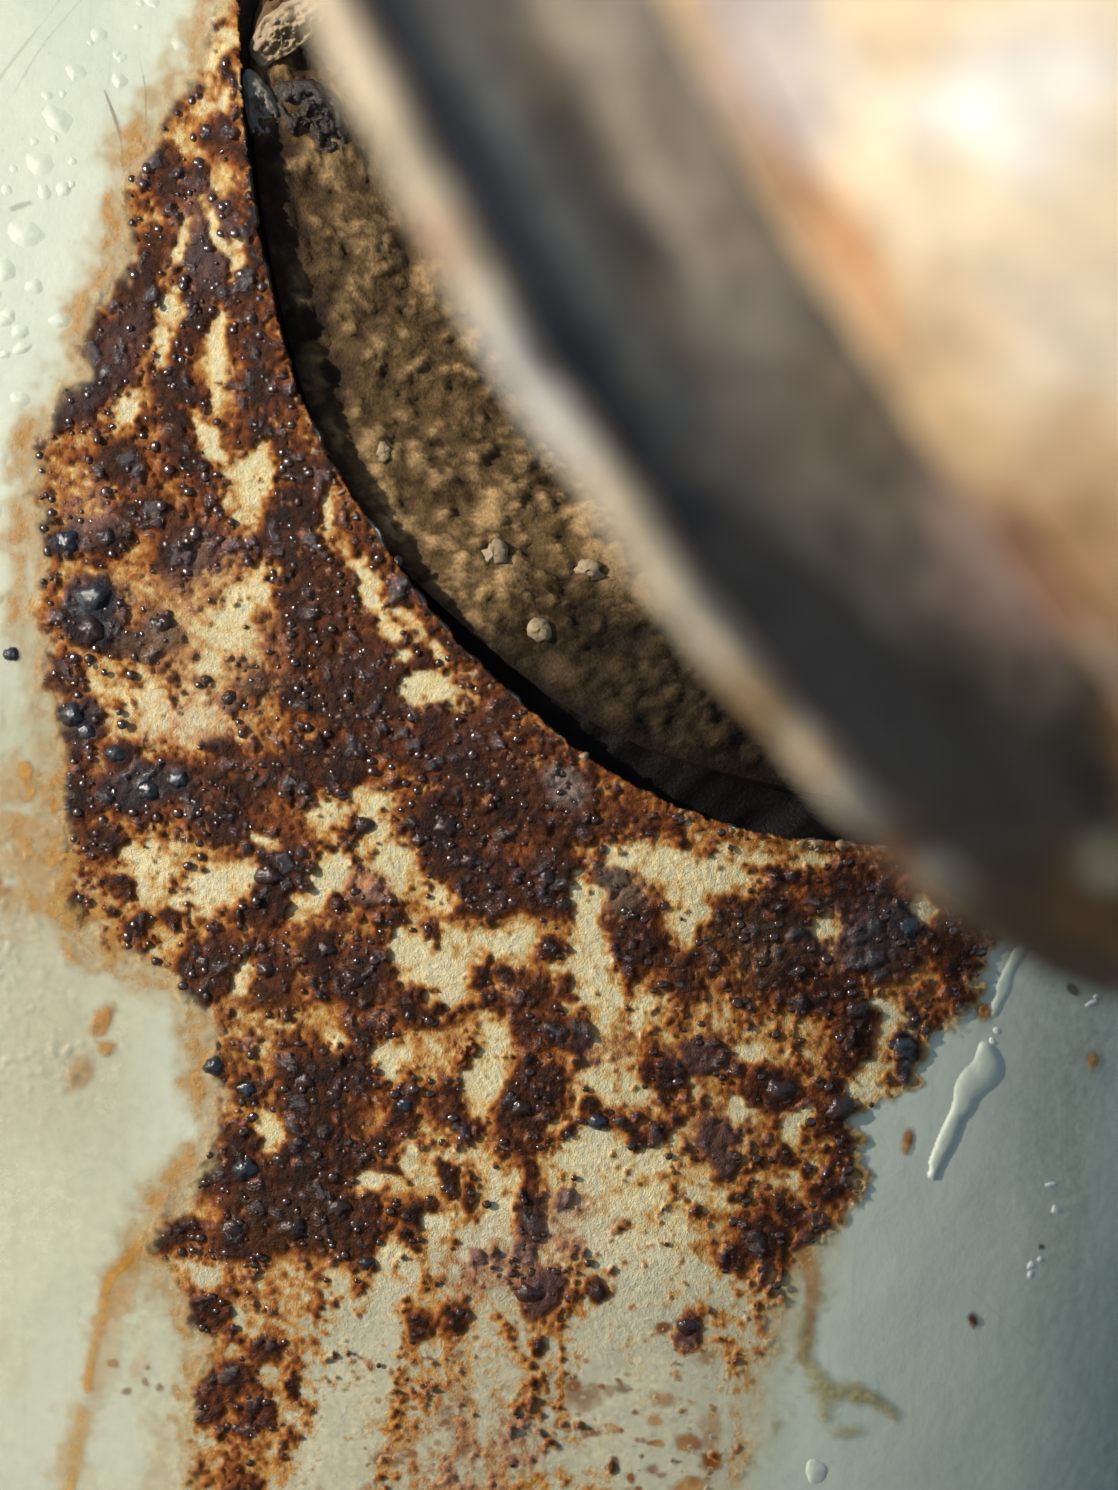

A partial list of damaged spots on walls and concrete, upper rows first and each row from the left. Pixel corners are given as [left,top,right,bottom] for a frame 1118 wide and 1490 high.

rust [2,638,20,661]
rust [45,852,82,929]
rust [92,1007,112,1055]
rust [978,1004,991,1021]
rust [902,1130,913,1154]
rust [83,1235,147,1391]
rust [656,1323,670,1333]
rust [284,1328,399,1490]
rust [384,1407,457,1490]
rust [473,1356,522,1445]
rust [565,1333,711,1490]
rust [699,1356,751,1482]